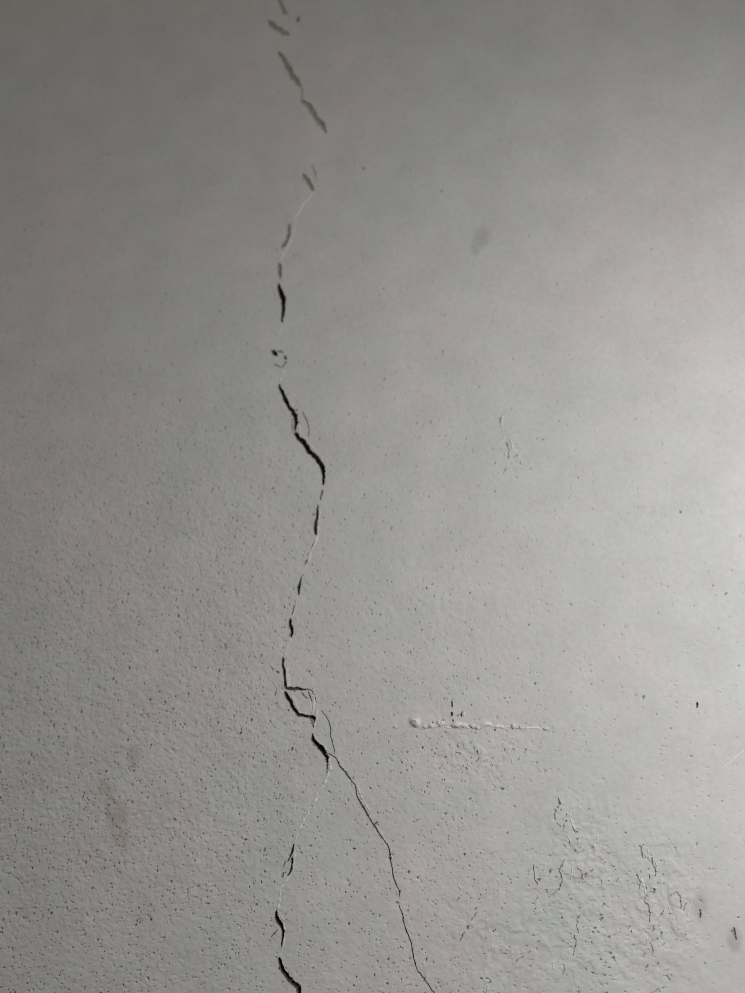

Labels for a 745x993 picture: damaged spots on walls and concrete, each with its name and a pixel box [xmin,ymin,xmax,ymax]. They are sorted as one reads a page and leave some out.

crack [268,0,327,133]
crack [271,165,435,993]